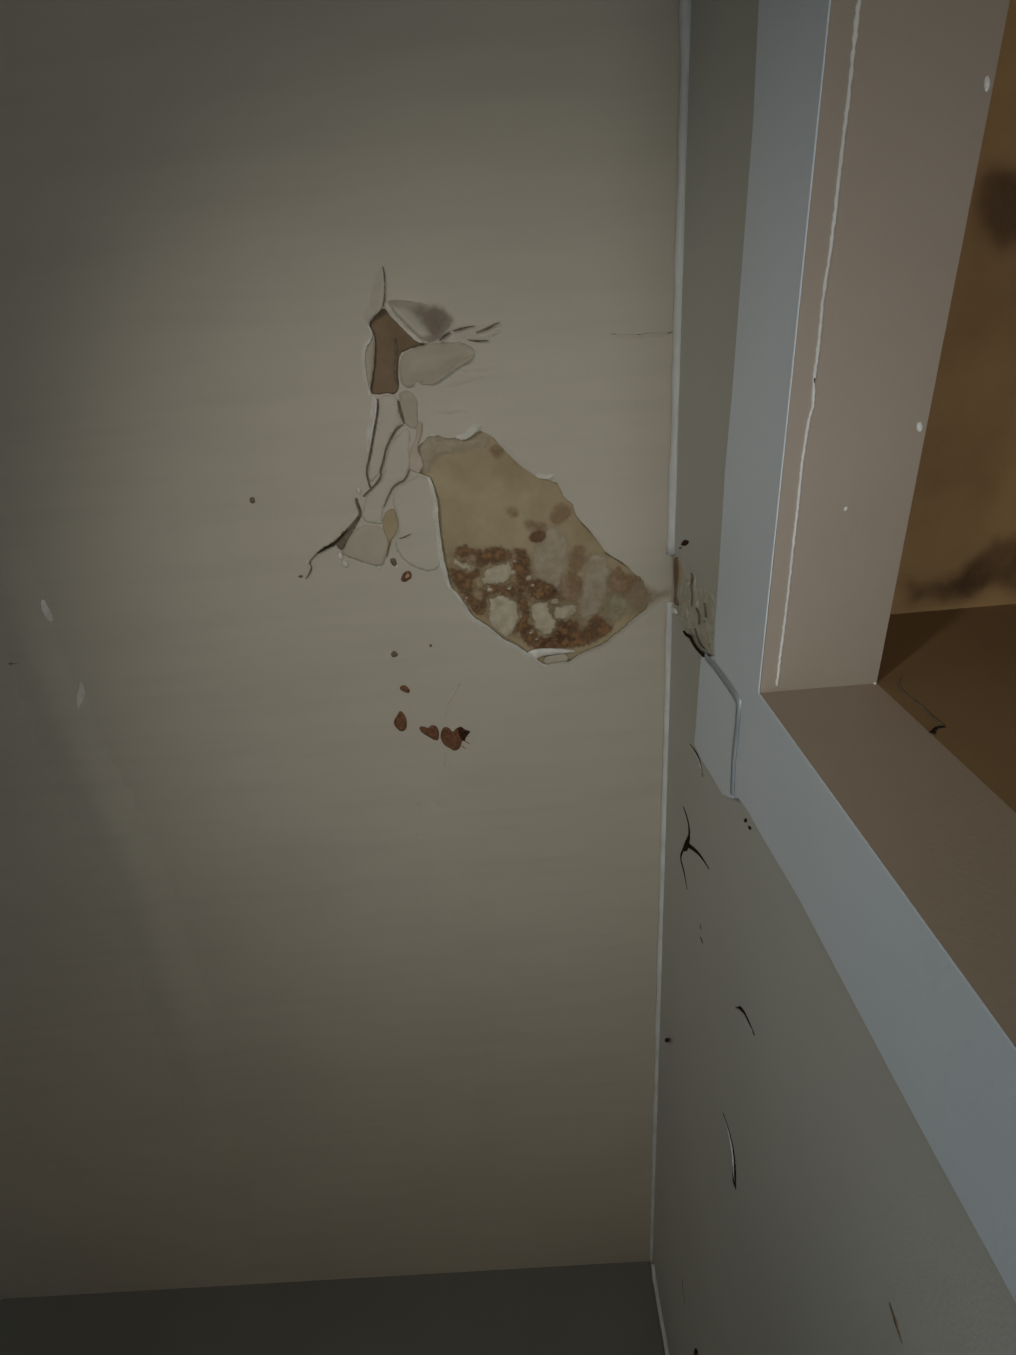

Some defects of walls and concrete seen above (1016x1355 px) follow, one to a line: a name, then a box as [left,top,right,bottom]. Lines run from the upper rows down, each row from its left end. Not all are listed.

flaking render [337,266,715,666]
rust [394,711,470,751]
crack [690,744,703,777]
crack [680,806,709,888]
crack [723,1113,736,1190]